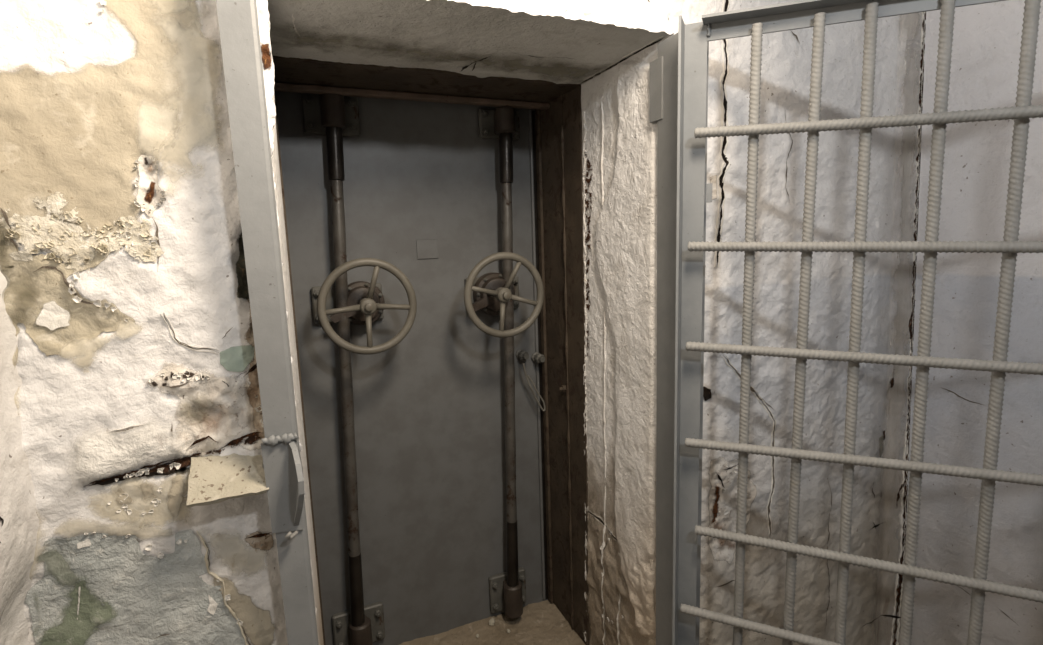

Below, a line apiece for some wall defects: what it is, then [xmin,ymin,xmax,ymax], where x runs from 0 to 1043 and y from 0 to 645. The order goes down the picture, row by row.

peeling [0,0,220,372]
peeling [24,233,275,645]
crack [710,39,730,267]
crack [722,0,730,12]
crack [862,12,926,645]